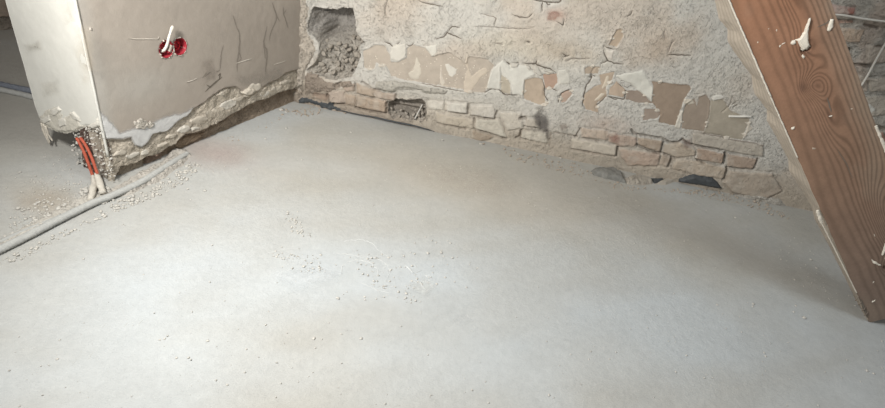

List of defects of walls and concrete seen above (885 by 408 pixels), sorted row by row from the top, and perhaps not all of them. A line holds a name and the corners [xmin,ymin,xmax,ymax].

crack [204,16,242,92]
spalling [39,0,494,181]
crack [263,3,288,74]
crack [436,0,626,114]
peeling [522,65,751,140]